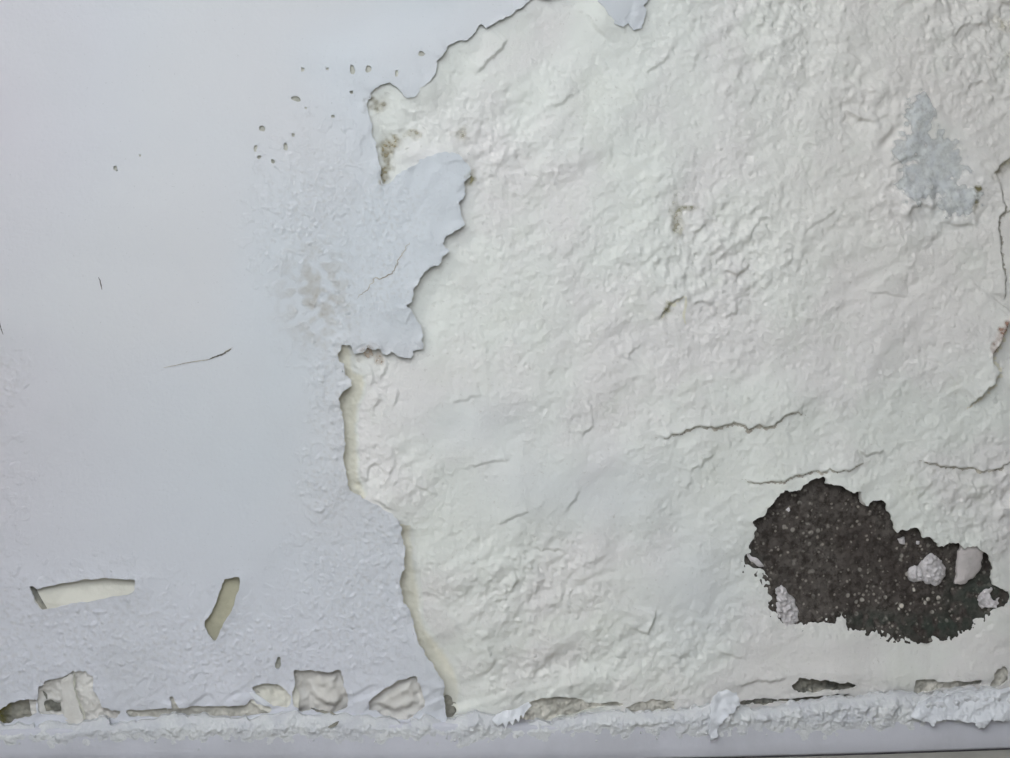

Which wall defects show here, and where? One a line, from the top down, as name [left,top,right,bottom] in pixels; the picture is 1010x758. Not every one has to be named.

crack [994,159,1010,299]
peeling [349,0,1010,741]
crack [967,324,1009,409]
crack [655,412,806,439]
crack [919,460,1010,474]
spalling [30,578,135,609]
spalling [205,577,240,640]
peeling [29,671,118,724]
peeling [250,670,348,728]